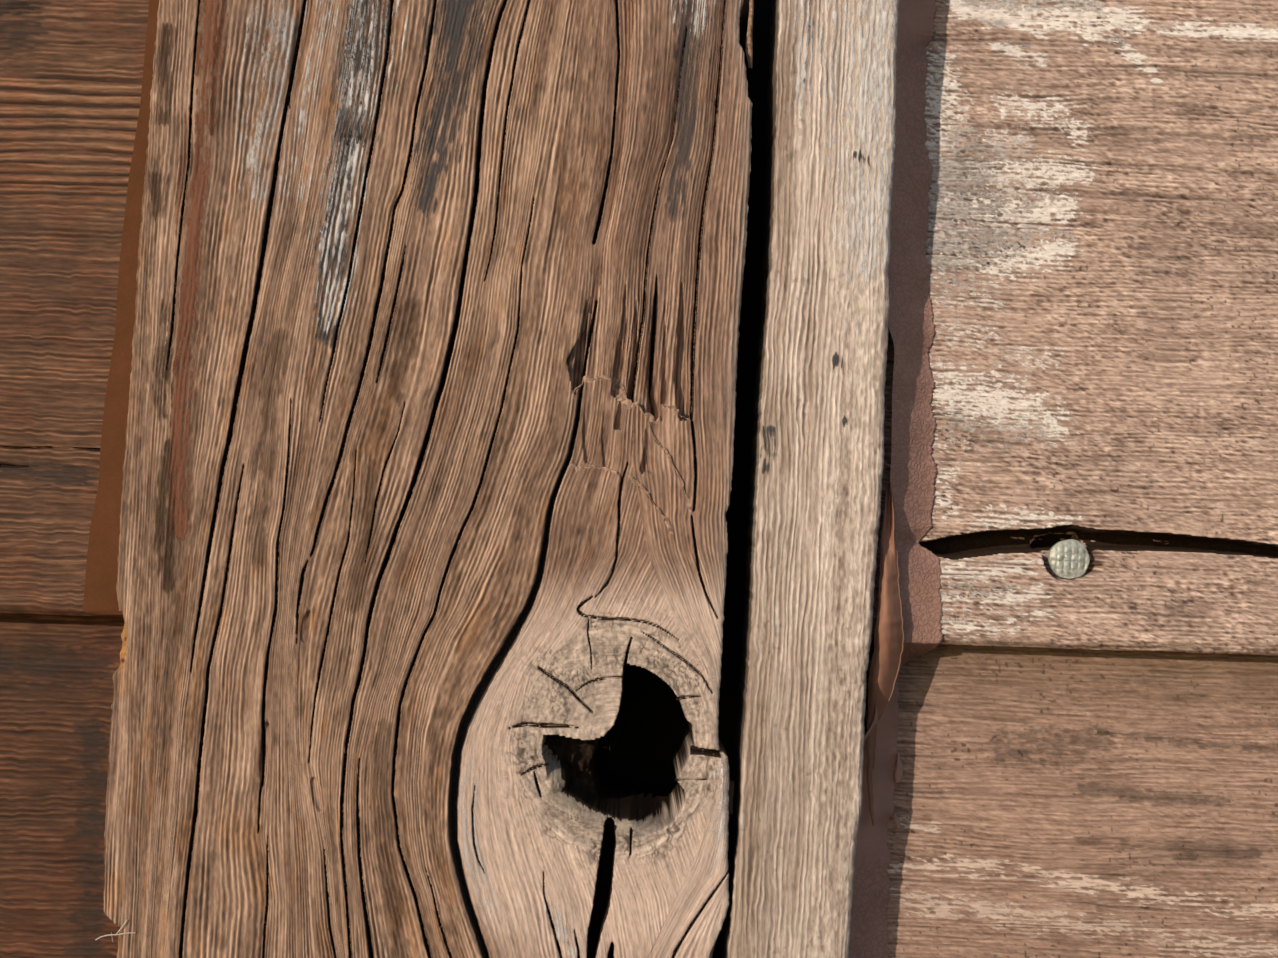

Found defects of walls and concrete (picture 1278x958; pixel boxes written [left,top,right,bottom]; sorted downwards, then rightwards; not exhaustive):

crack [592,1,620,245]
crack [631,28,687,403]
crack [689,0,726,617]
crack [258,0,531,958]
crack [392,199,598,958]
crack [509,463,713,729]
crack [919,524,1278,560]
crack [543,817,633,958]
crack [675,745,721,781]
crack [672,870,729,958]